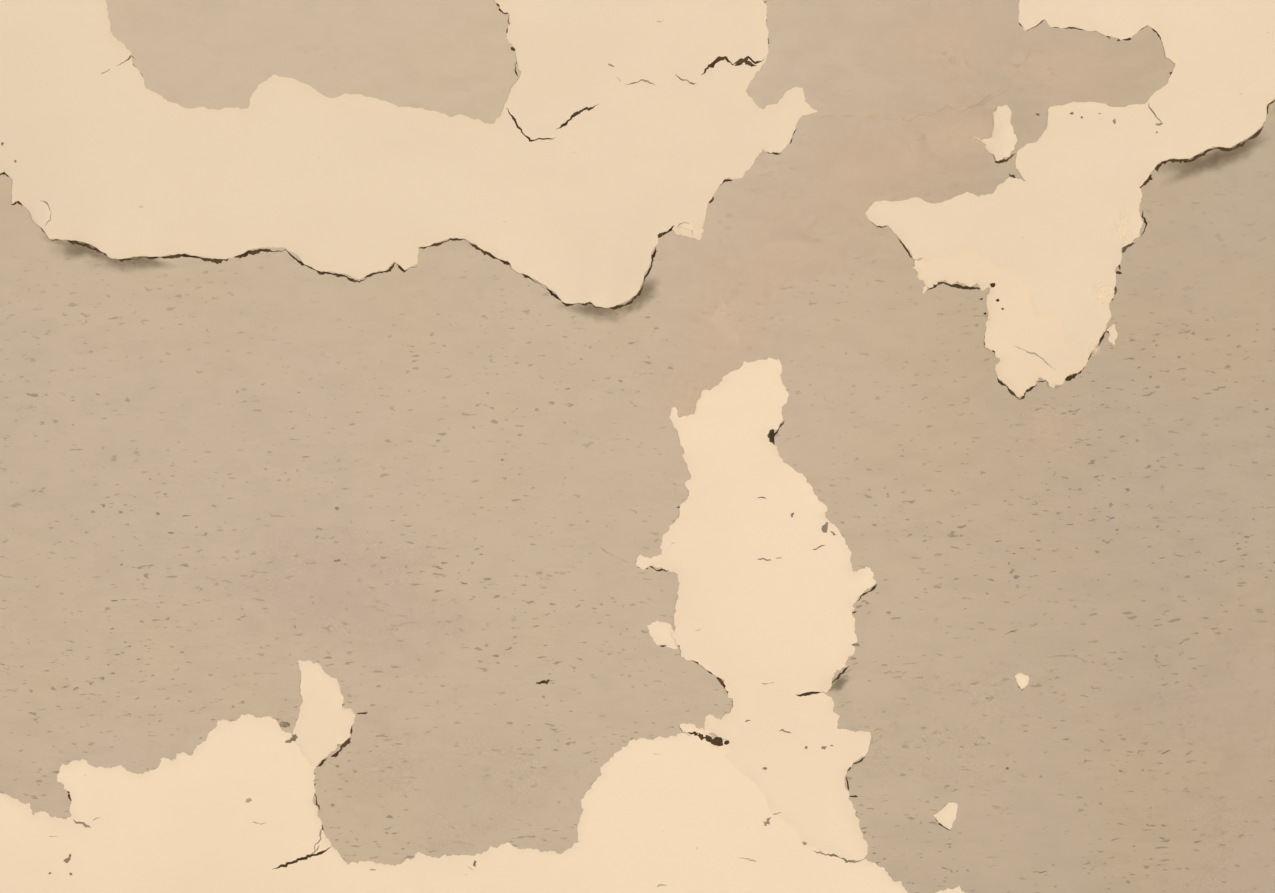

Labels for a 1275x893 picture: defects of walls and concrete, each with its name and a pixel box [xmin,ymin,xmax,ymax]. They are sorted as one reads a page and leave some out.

peeling [106,0,521,124]
peeling [0,172,748,866]
peeling [687,0,1275,893]